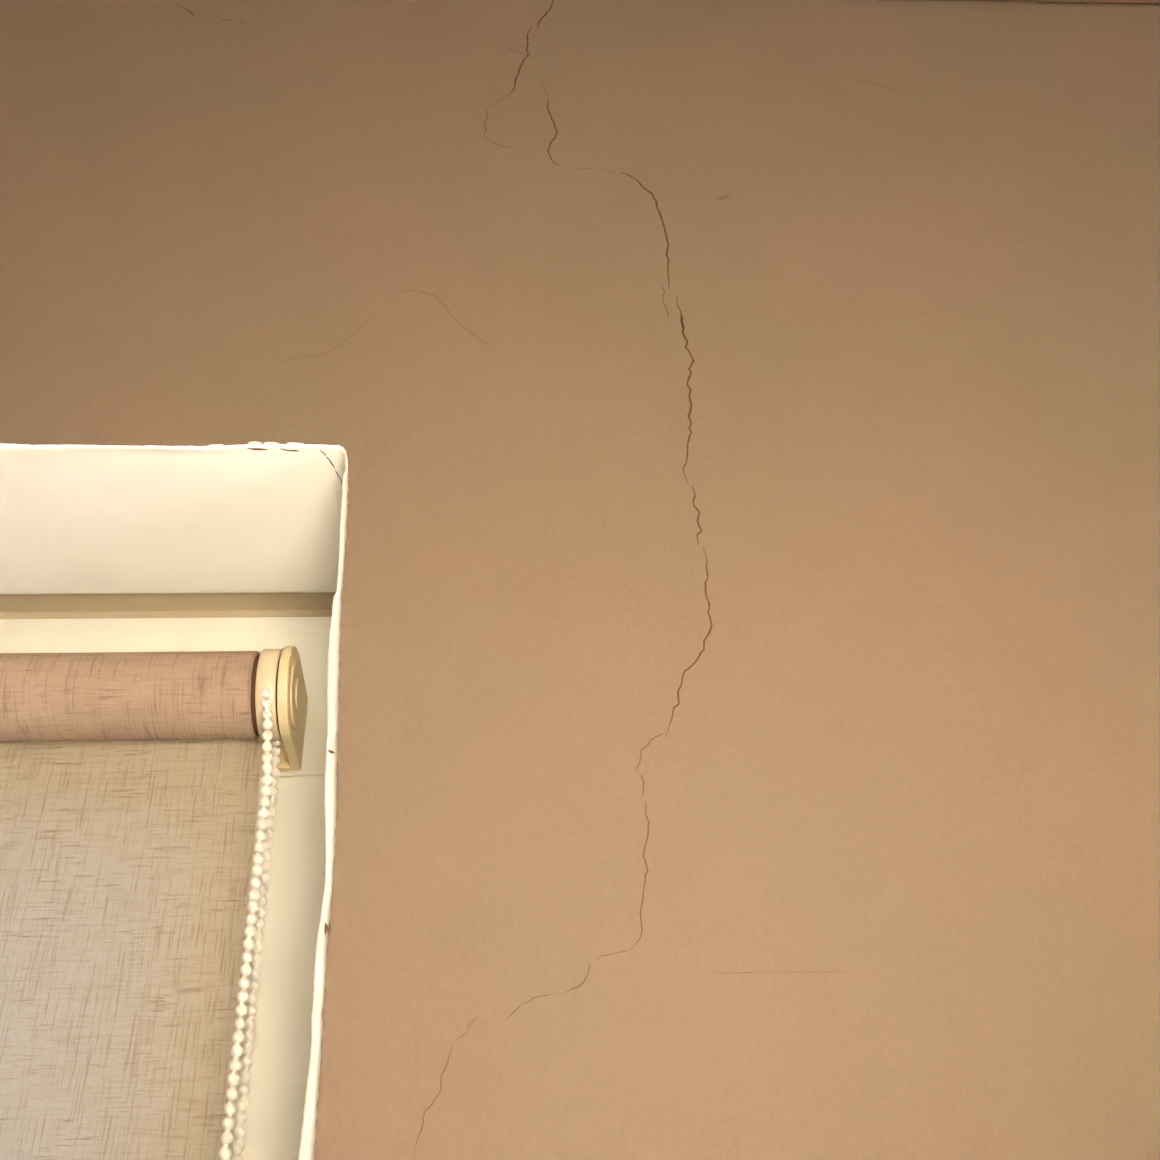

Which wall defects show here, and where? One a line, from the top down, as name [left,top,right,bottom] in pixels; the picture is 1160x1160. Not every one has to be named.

crack [483,0,713,1019]
crack [414,1015,478,1151]